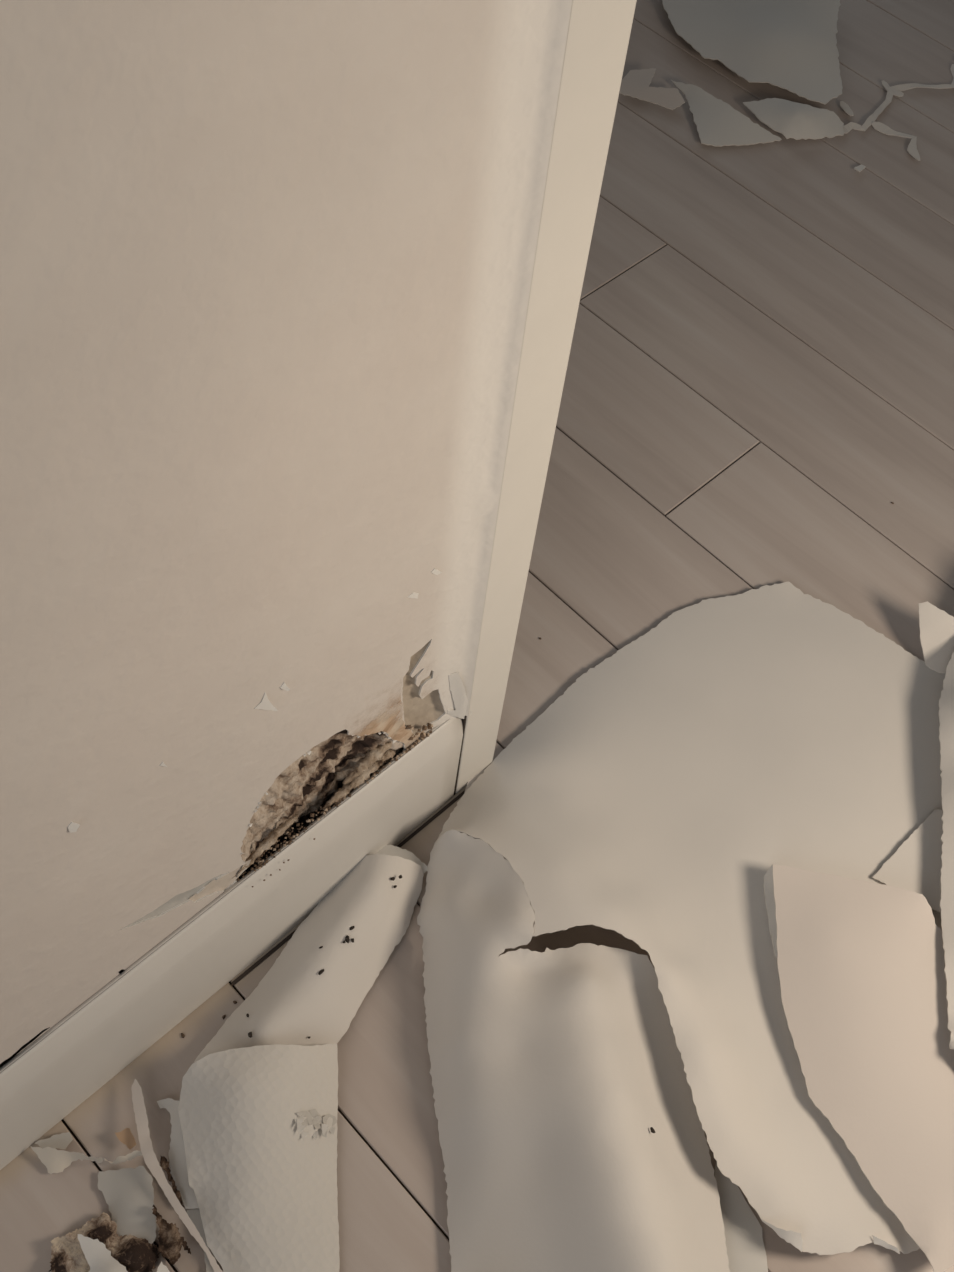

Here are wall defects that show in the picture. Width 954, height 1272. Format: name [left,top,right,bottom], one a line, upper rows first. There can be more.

flaking render [189,641,444,902]